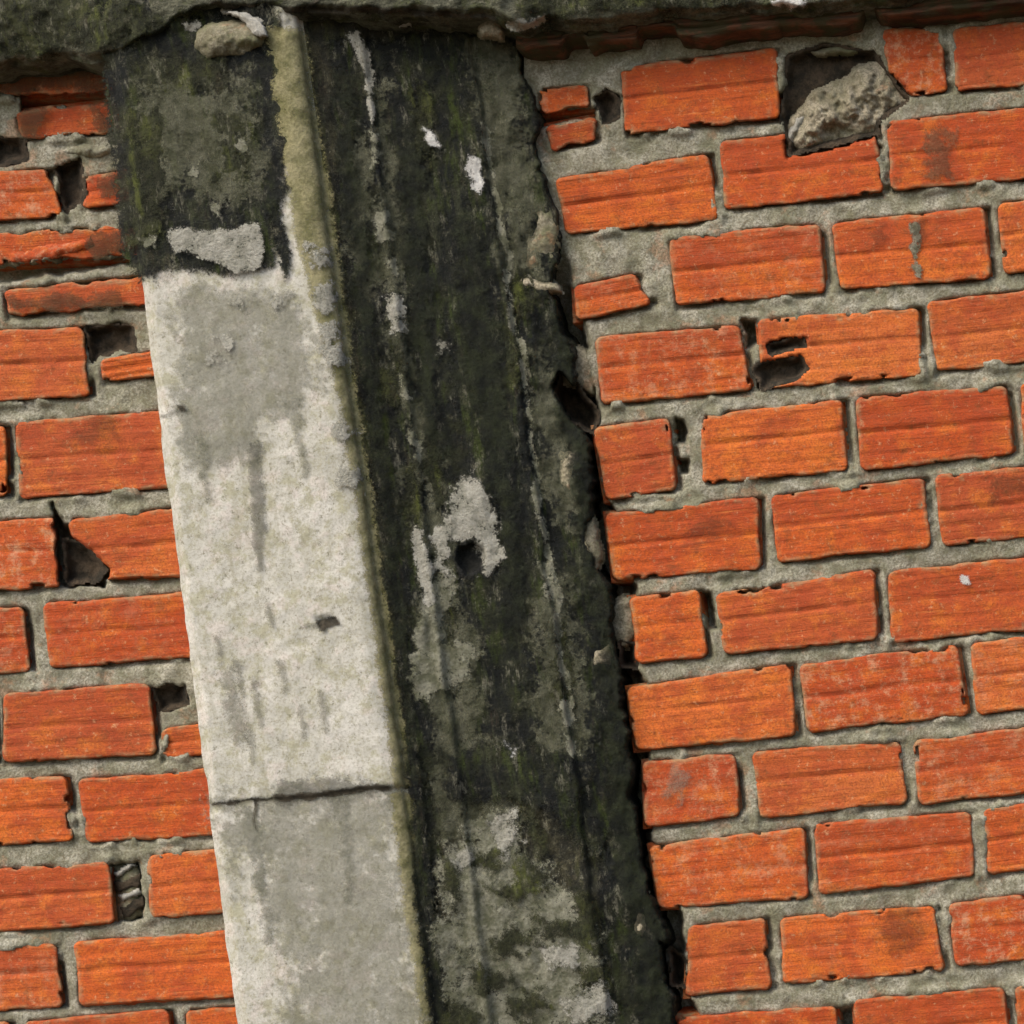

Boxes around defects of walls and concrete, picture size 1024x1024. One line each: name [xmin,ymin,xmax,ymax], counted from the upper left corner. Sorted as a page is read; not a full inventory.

spalling [780,44,909,157]
water stain [205,330,234,367]
spalling [752,337,809,391]
water stain [325,16,677,1024]
crack [212,778,429,831]